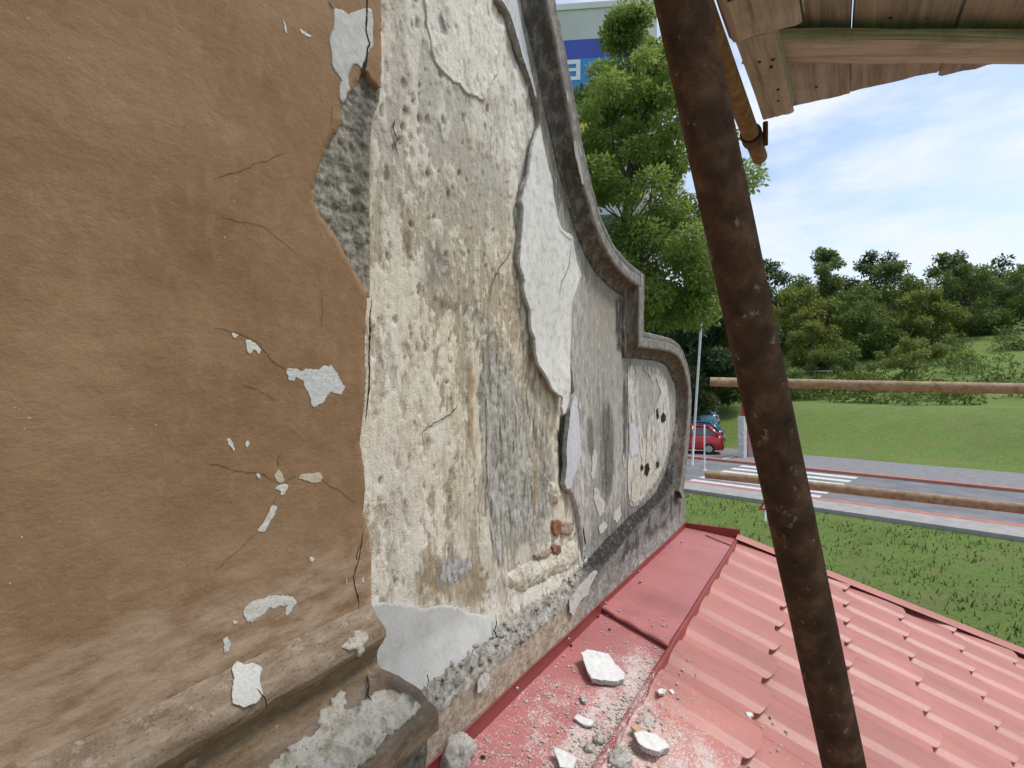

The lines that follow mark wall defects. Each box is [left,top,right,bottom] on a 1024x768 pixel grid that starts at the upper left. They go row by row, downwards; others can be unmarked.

crack [362,0,371,74]
spalling [312,8,380,298]
flaking render [517,125,670,534]
peeling [286,365,346,413]
crack [353,534,363,609]
flaking render [533,519,574,559]
peeling [233,595,297,624]
peeling [232,661,263,707]
flaking render [268,566,597,768]